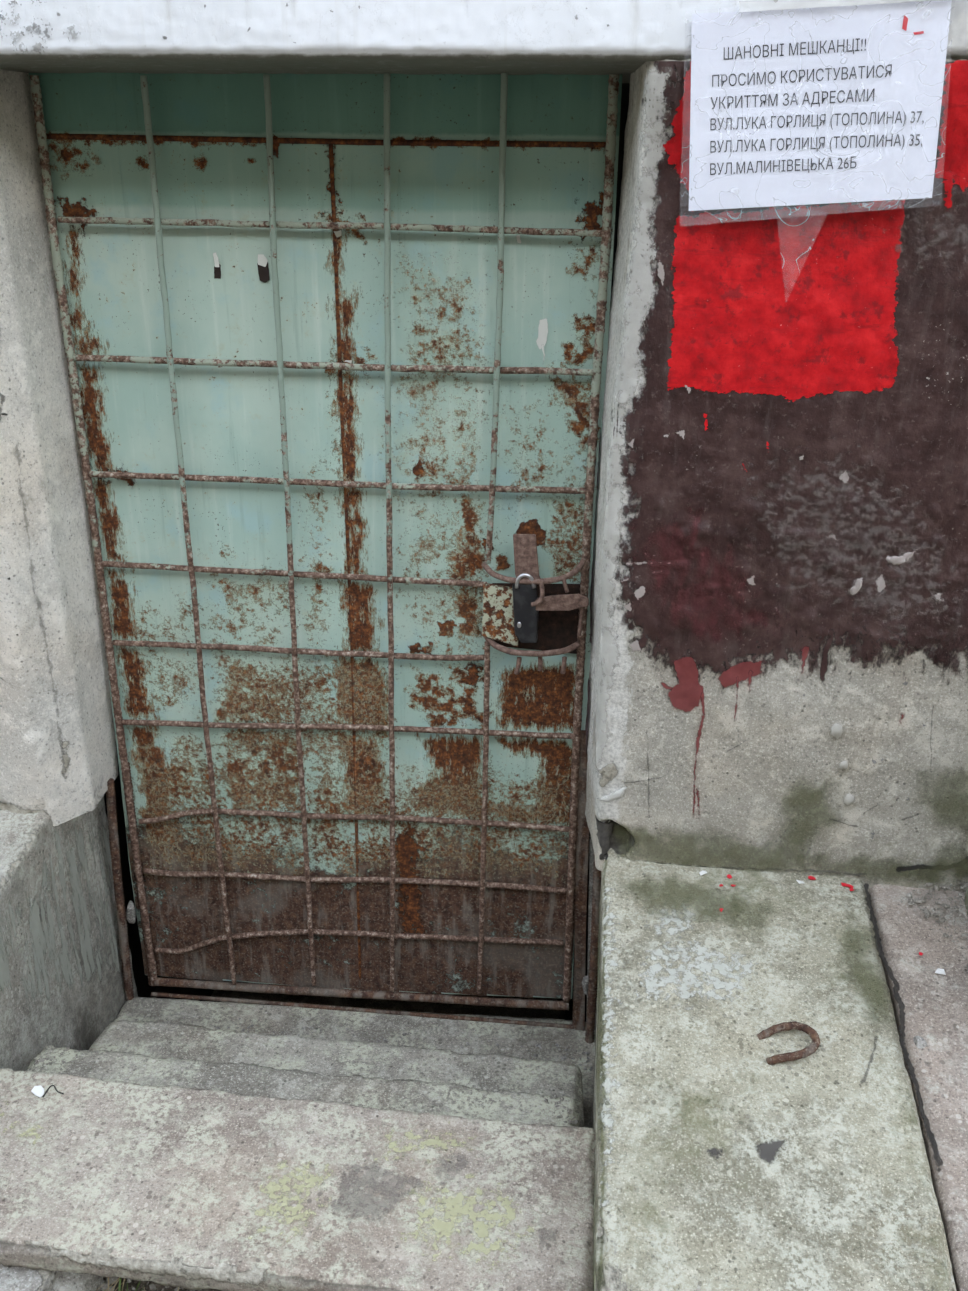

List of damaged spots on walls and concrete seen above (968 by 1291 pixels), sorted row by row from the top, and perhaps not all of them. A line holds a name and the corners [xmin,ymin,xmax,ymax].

peeling [0,0,78,54]
corrosion [48,132,280,180]
corrosion [566,192,613,296]
corrosion [504,310,607,582]
corrosion [54,145,576,999]